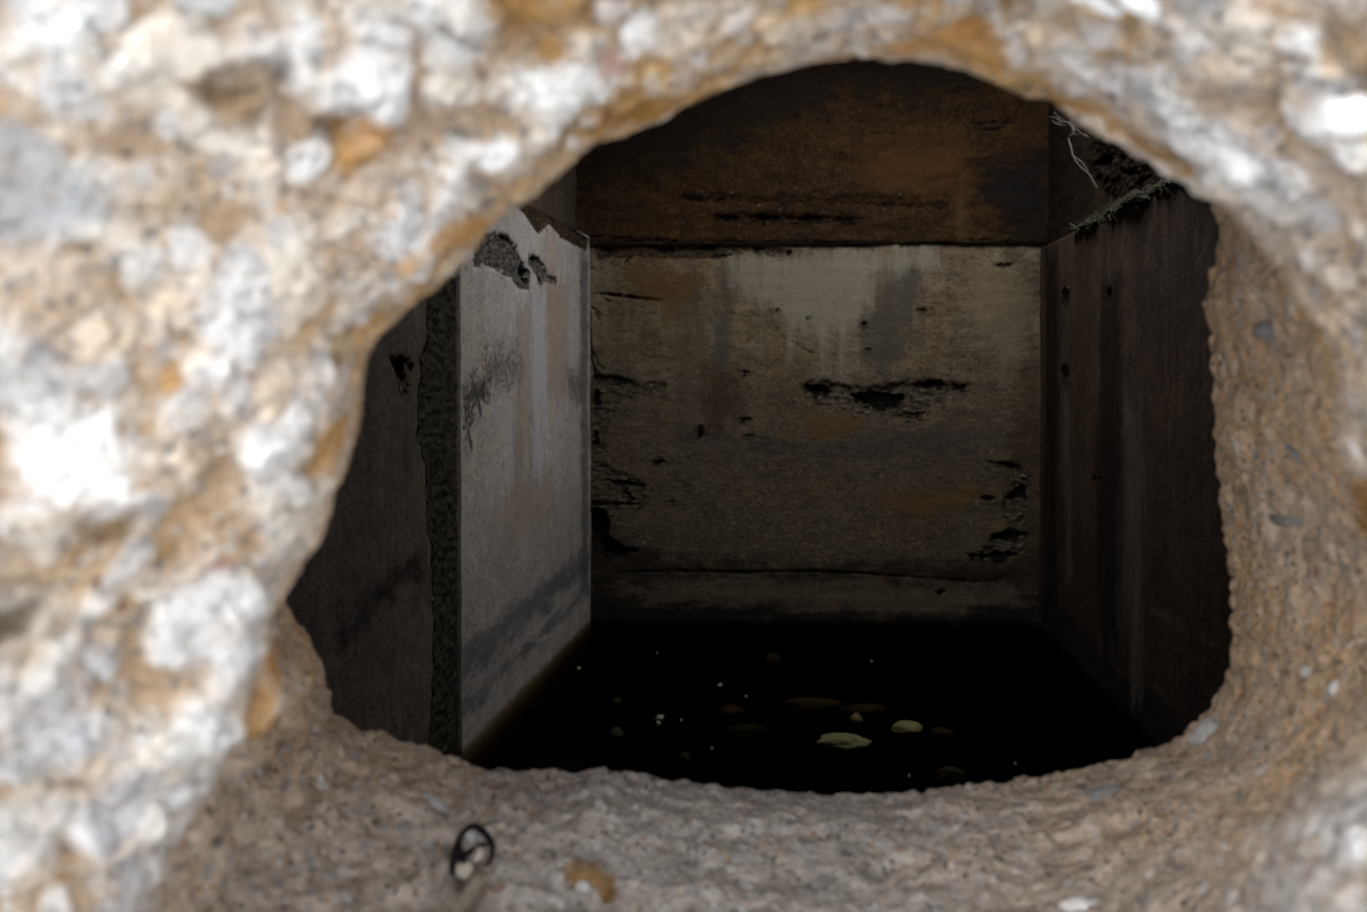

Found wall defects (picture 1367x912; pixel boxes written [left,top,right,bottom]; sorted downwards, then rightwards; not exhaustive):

rust [591,86,672,140]
spalling [389,232,559,757]
spalling [590,369,669,559]
water stain [461,247,1184,748]
spalling [798,377,976,422]
spalling [967,461,1030,561]